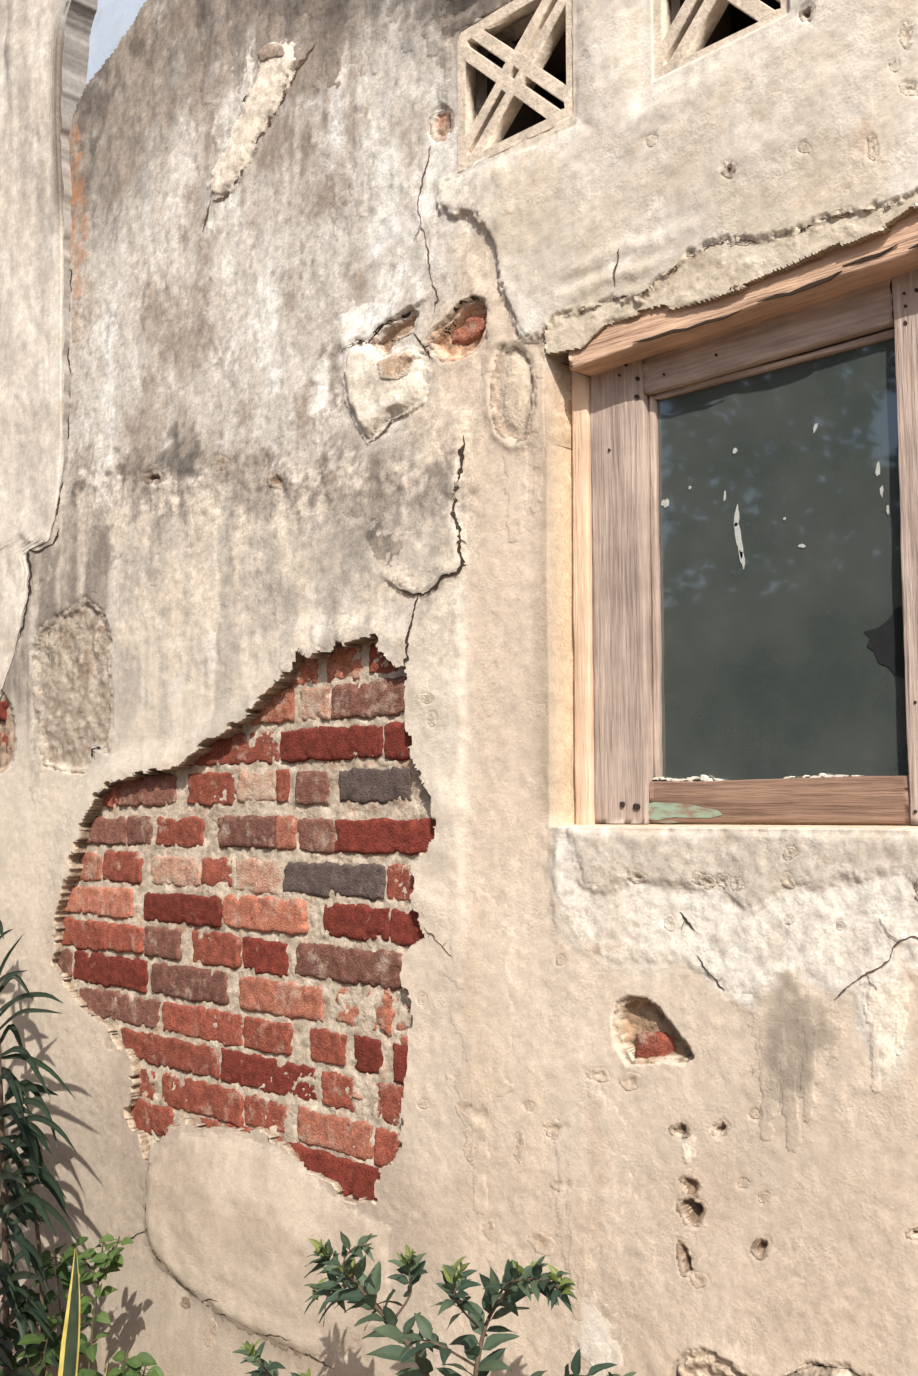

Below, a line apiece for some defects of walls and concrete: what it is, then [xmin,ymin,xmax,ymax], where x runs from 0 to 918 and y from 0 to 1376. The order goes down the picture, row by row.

water stain [478,12,535,55]
water stain [155,0,513,367]
crack [342,146,482,359]
peeling [341,297,487,445]
crack [19,348,71,637]
water stain [251,421,467,672]
crack [396,435,466,668]
spalling [31,597,113,774]
flaking render [50,633,436,1206]
spalling [585,996,694,1091]
water stain [741,967,844,1153]
crack [834,920,918,1000]